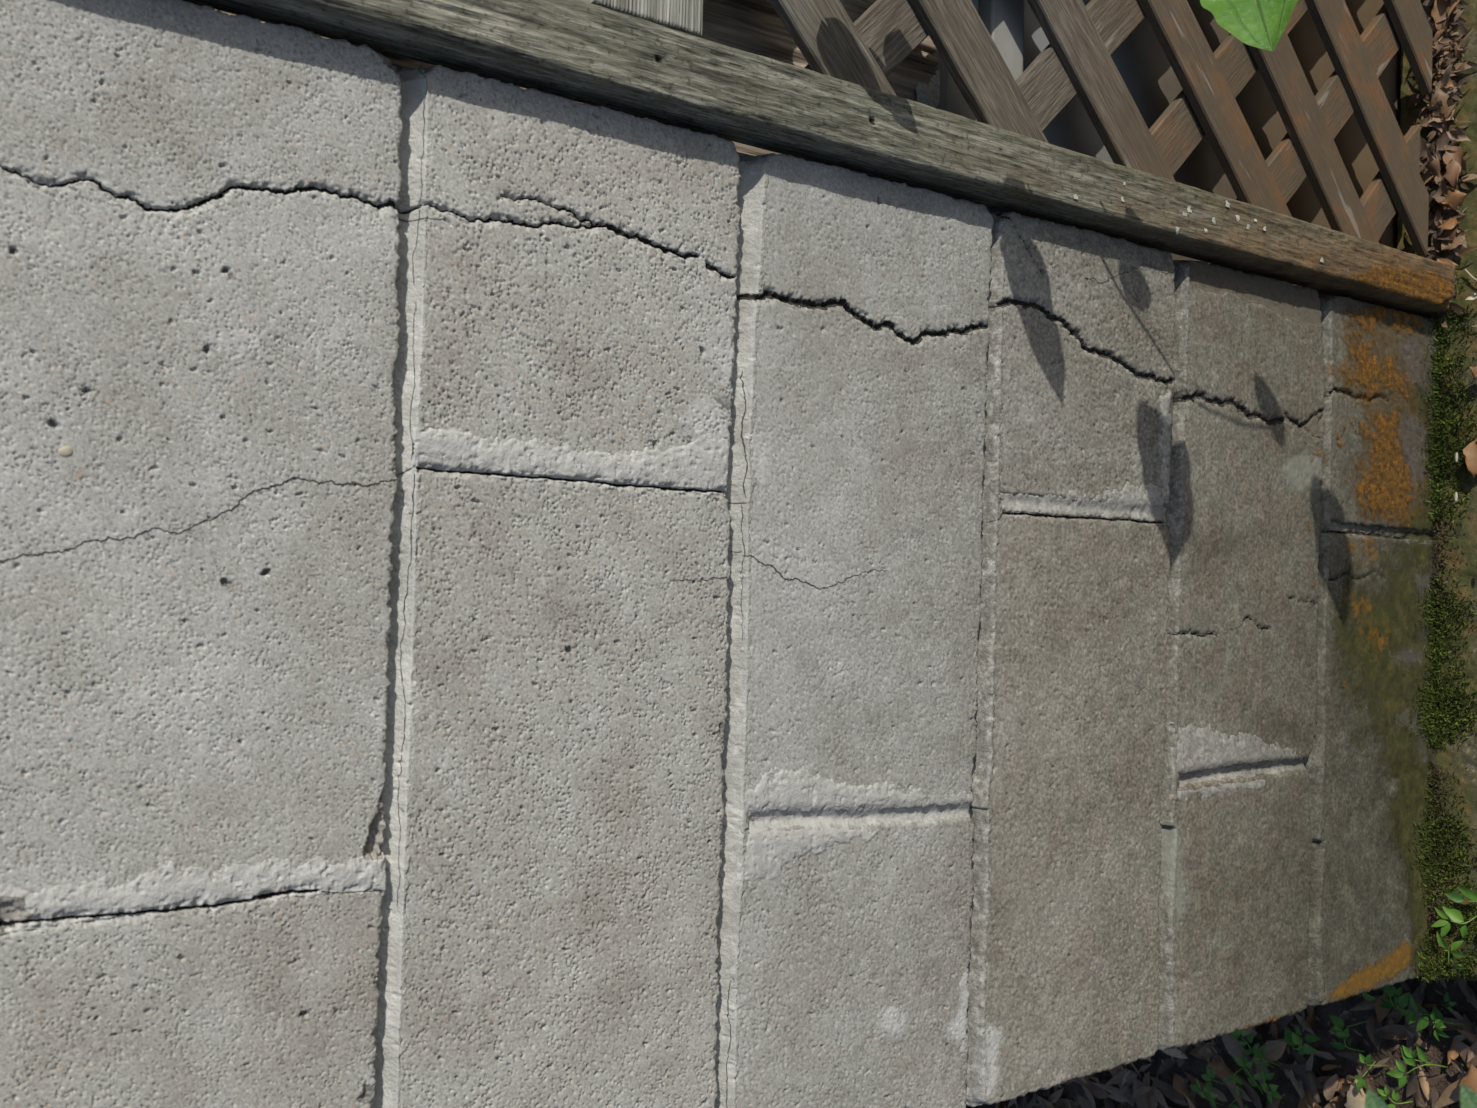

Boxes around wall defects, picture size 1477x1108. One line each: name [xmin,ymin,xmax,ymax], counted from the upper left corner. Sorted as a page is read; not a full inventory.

crack [0,61,1389,926]
crack [1288,530,1408,605]
water stain [1329,942,1412,1001]
crack [725,981,733,1108]